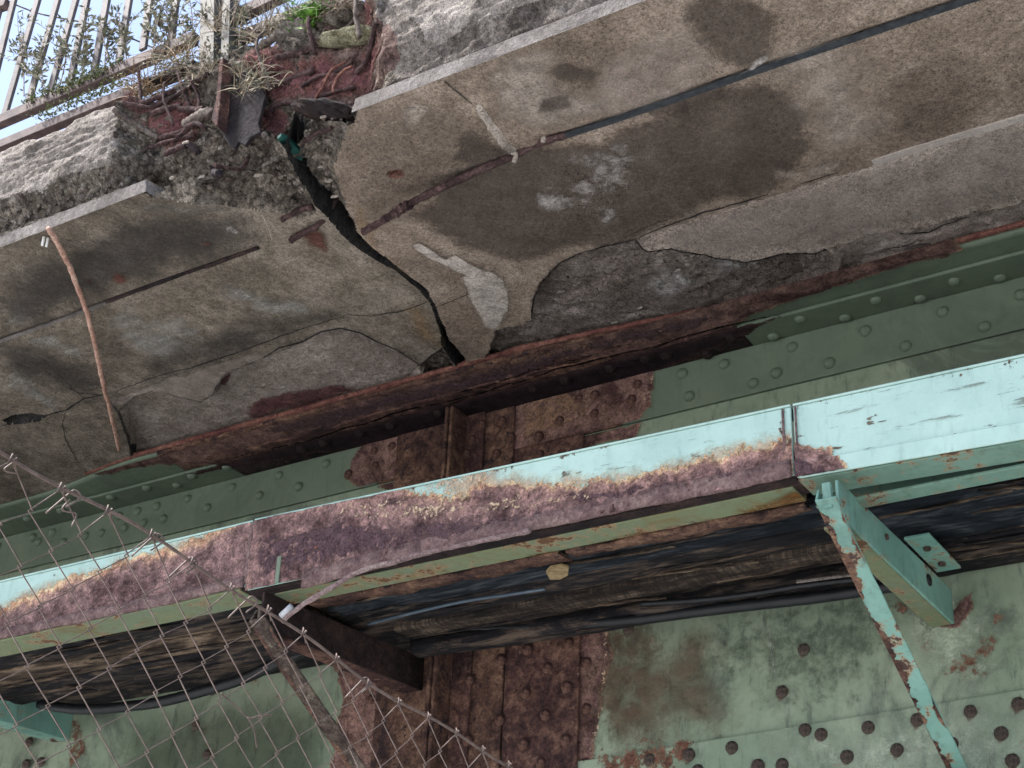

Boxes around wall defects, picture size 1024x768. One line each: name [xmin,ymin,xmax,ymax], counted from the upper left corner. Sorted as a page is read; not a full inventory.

spalling [0,0,401,244]
damp [496,55,594,124]
damp [422,86,807,261]
damp [687,0,770,64]
crack [43,111,469,462]
corrosion [94,238,963,490]
spalling [484,201,1024,358]
corrosion [308,492,812,609]
corrosion [940,593,973,629]
corrosion [944,614,1004,678]